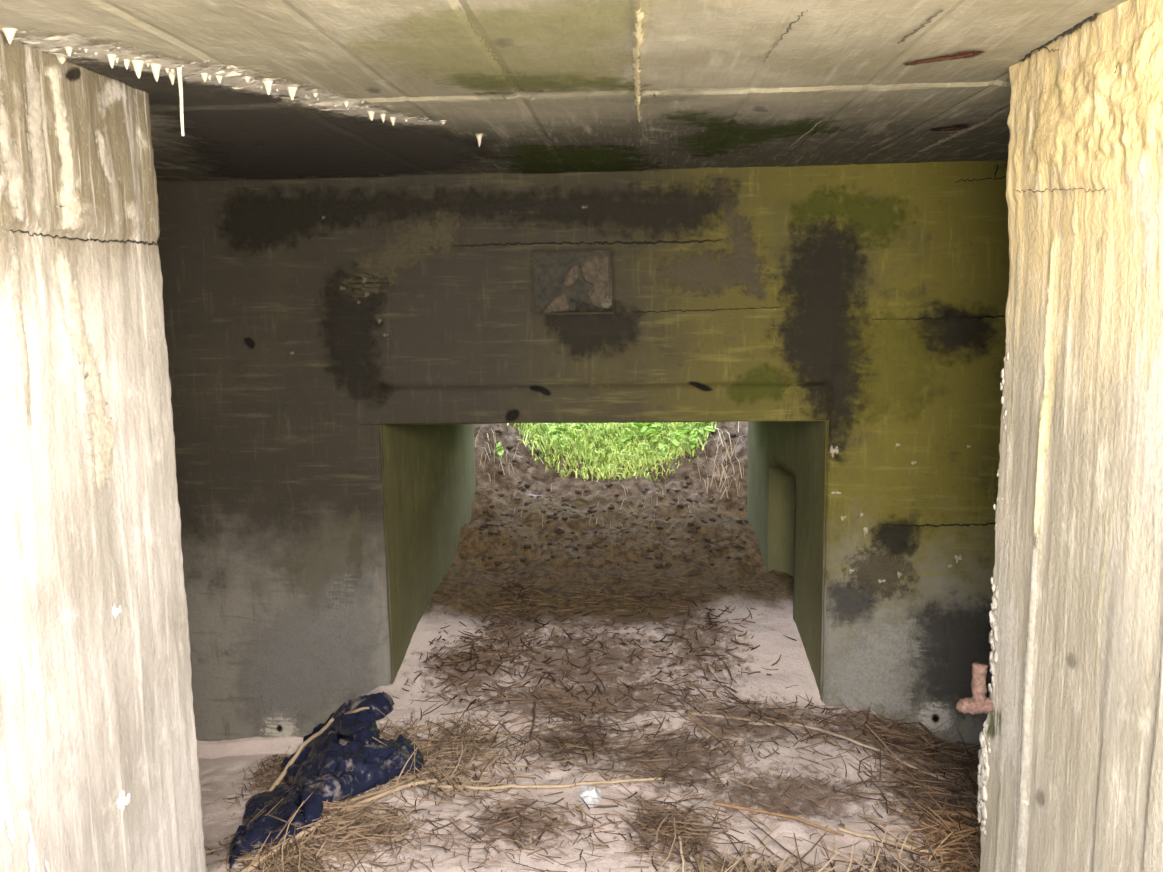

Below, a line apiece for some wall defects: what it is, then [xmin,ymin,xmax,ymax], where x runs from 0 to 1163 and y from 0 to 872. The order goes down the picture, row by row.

crack [9,229,159,245]
water stain [47,58,498,231]
crack [956,165,1110,193]
water stain [51,252,114,492]
water stain [546,301,641,357]
water stain [774,219,869,461]
water stain [919,302,997,358]
water stain [871,521,919,556]
crack [890,521,996,529]
spalling [988,576,999,695]
water stain [824,549,1037,872]
spalling [977,717,991,837]